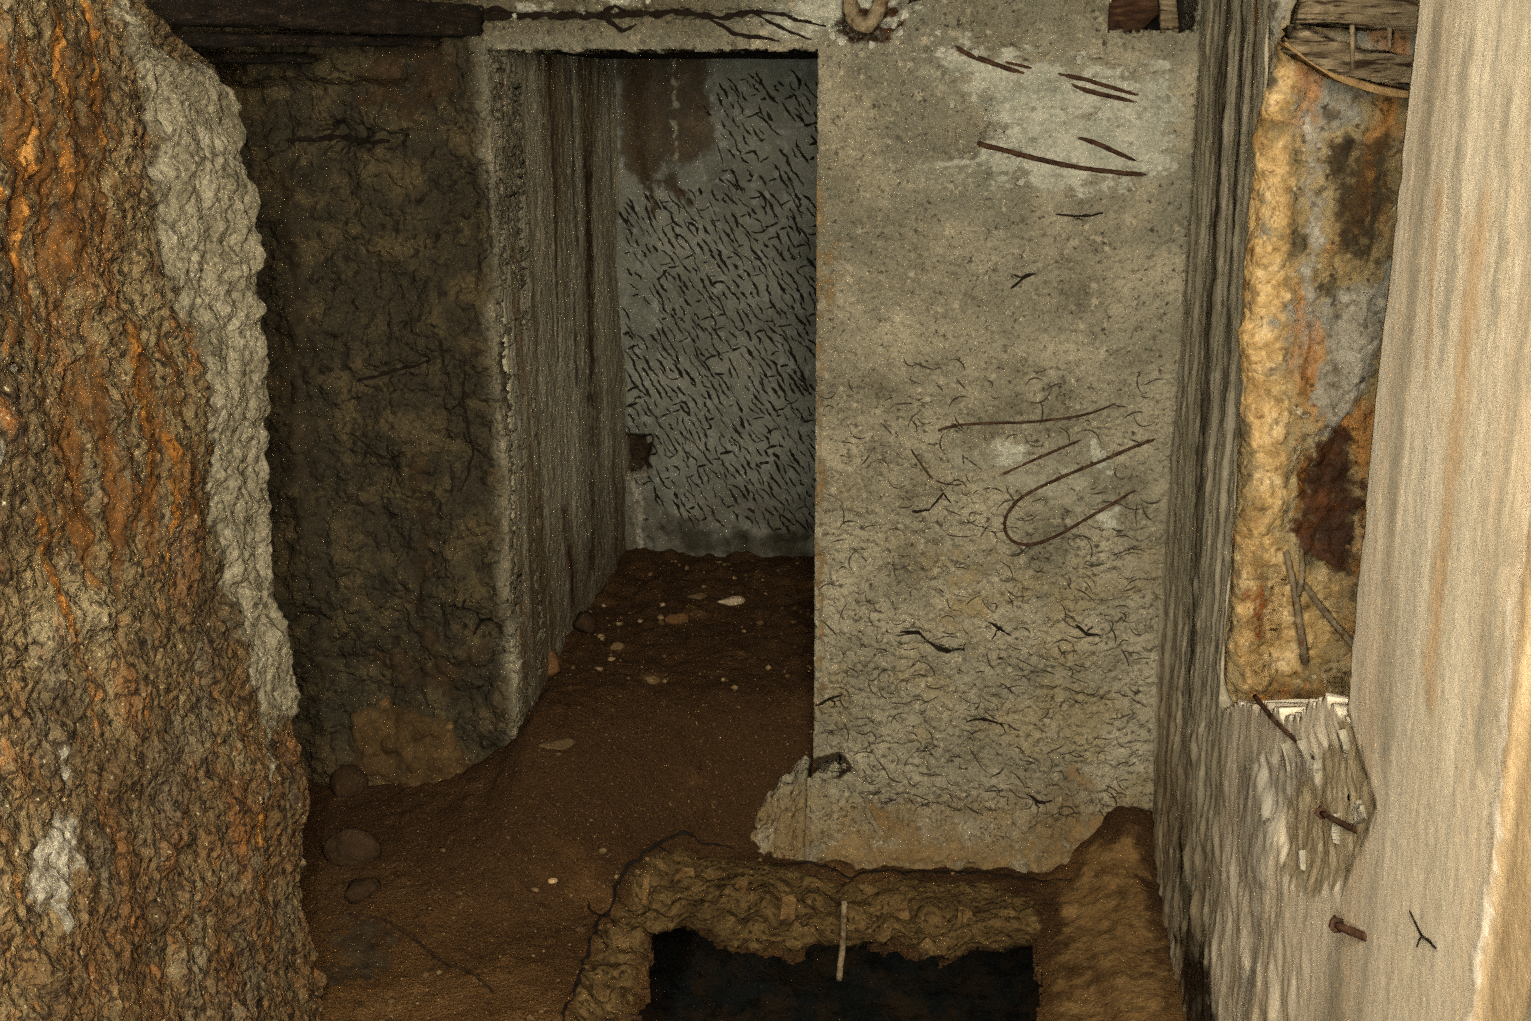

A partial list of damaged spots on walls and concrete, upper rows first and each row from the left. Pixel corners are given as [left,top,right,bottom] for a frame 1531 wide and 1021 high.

crack [483,4,826,42]
crack [815,356,1167,824]
corrosion [1290,426,1366,580]
spalling [1281,719,1375,898]